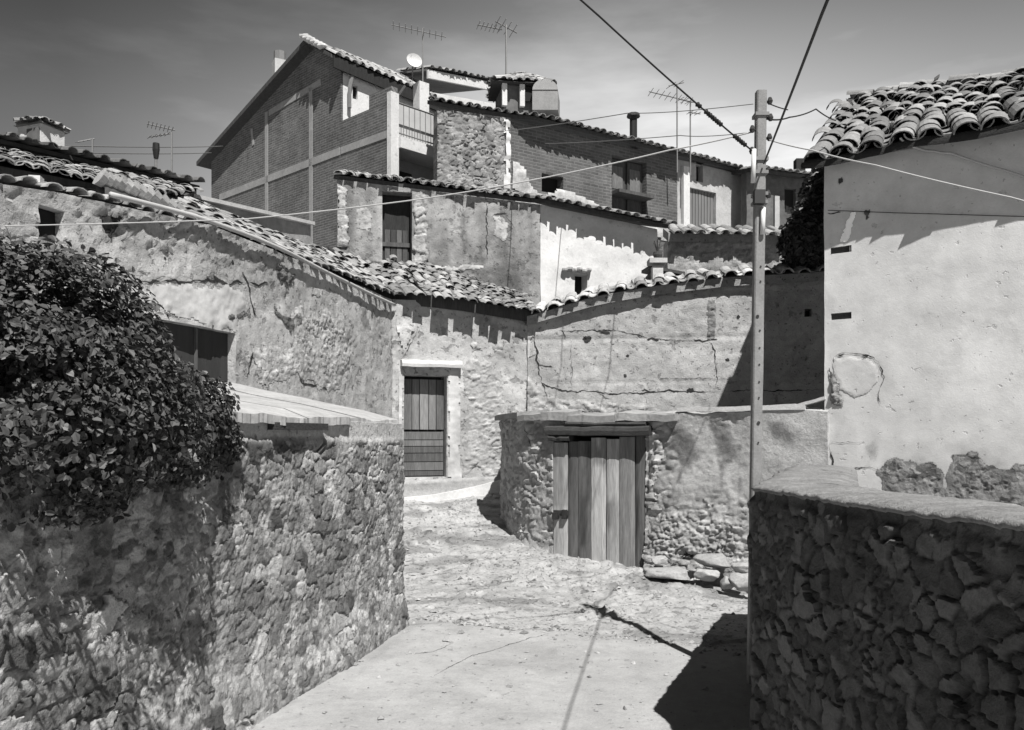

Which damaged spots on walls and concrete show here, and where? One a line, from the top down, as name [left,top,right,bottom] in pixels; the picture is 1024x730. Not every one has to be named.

spalling [493,216,509,241]
spalling [440,264,483,273]
crack [529,329,818,399]
spalling [829,368,844,407]
spalling [876,451,1024,506]